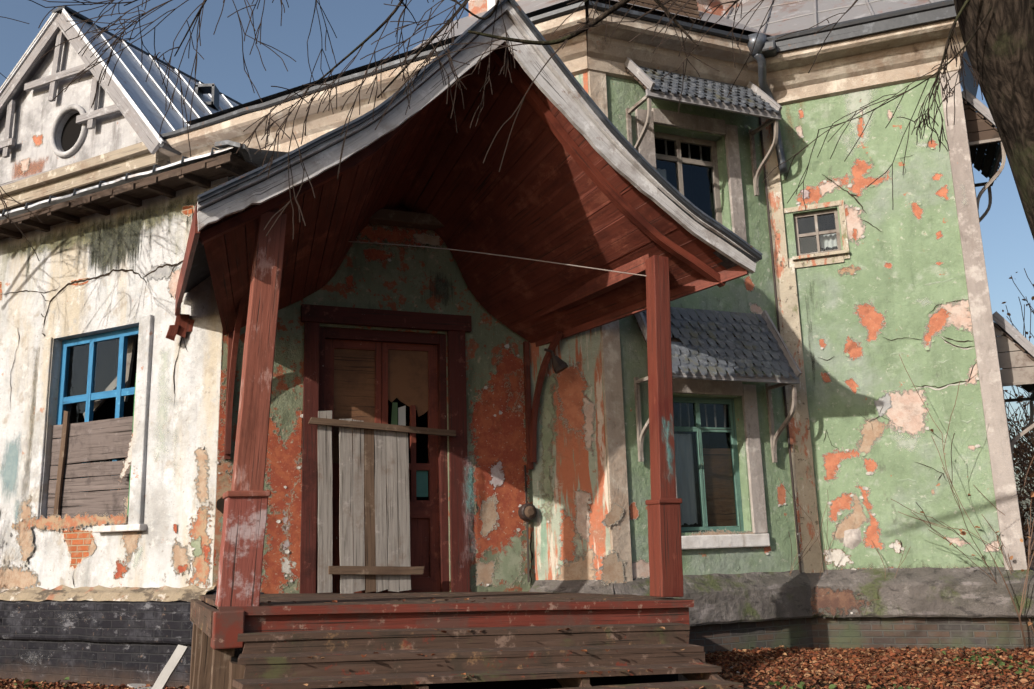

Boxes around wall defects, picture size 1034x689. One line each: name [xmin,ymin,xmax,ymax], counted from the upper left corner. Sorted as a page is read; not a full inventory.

water stain [78,211,153,271]
peeling [794,157,892,246]
crack [1,261,182,409]
crack [173,308,187,397]
crack [883,300,977,390]
flaking render [61,524,105,570]
peeling [113,433,144,579]
peeling [170,368,233,591]
peeling [260,408,303,594]
peeling [465,342,530,587]
spalling [547,489,650,585]
peeling [822,417,904,570]